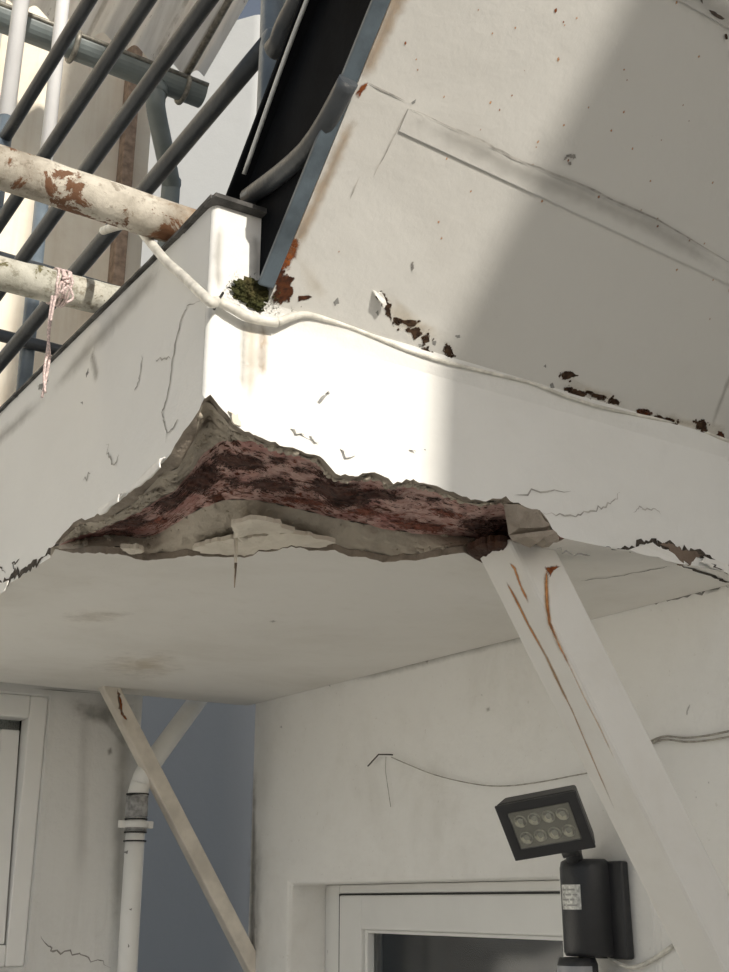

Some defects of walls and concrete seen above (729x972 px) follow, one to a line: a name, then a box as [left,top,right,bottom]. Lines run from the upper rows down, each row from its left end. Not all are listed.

rust [272,239,312,305]
peeling [373,290,460,358]
crack [135,301,199,442]
peeling [550,371,620,406]
spalling [50,395,564,588]
crack [518,488,658,517]
crack [557,538,729,604]
rust [508,564,607,787]
crack [41,937,110,968]